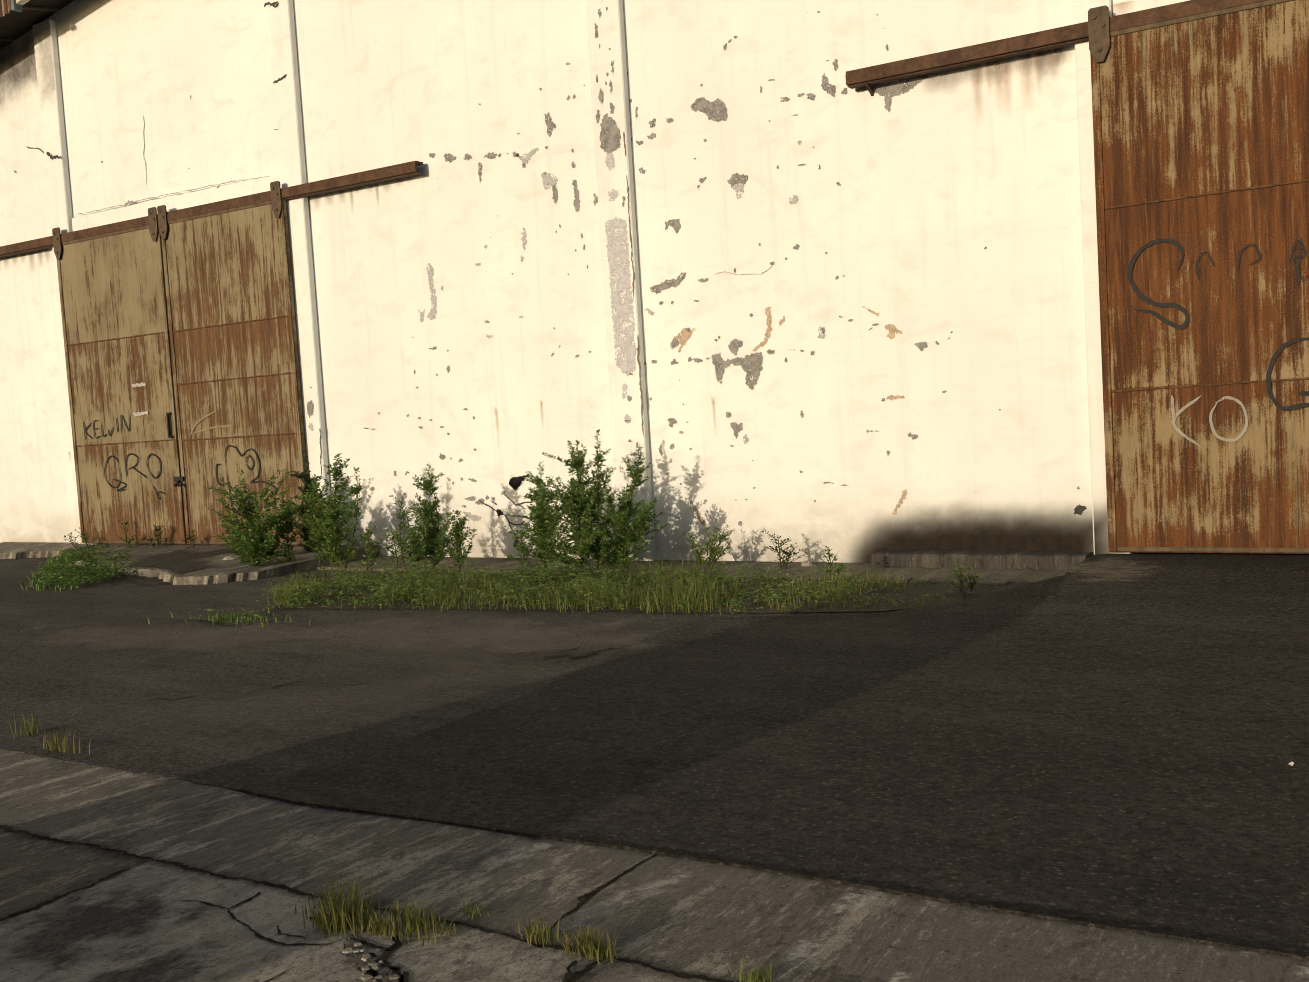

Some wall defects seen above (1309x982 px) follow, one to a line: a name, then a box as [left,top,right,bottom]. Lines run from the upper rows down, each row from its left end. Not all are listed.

peeling [429,112,556,182]
peeling [567,7,674,171]
peeling [690,84,728,122]
peeling [780,59,932,116]
peeling [541,148,825,456]
crack [0,825,733,982]